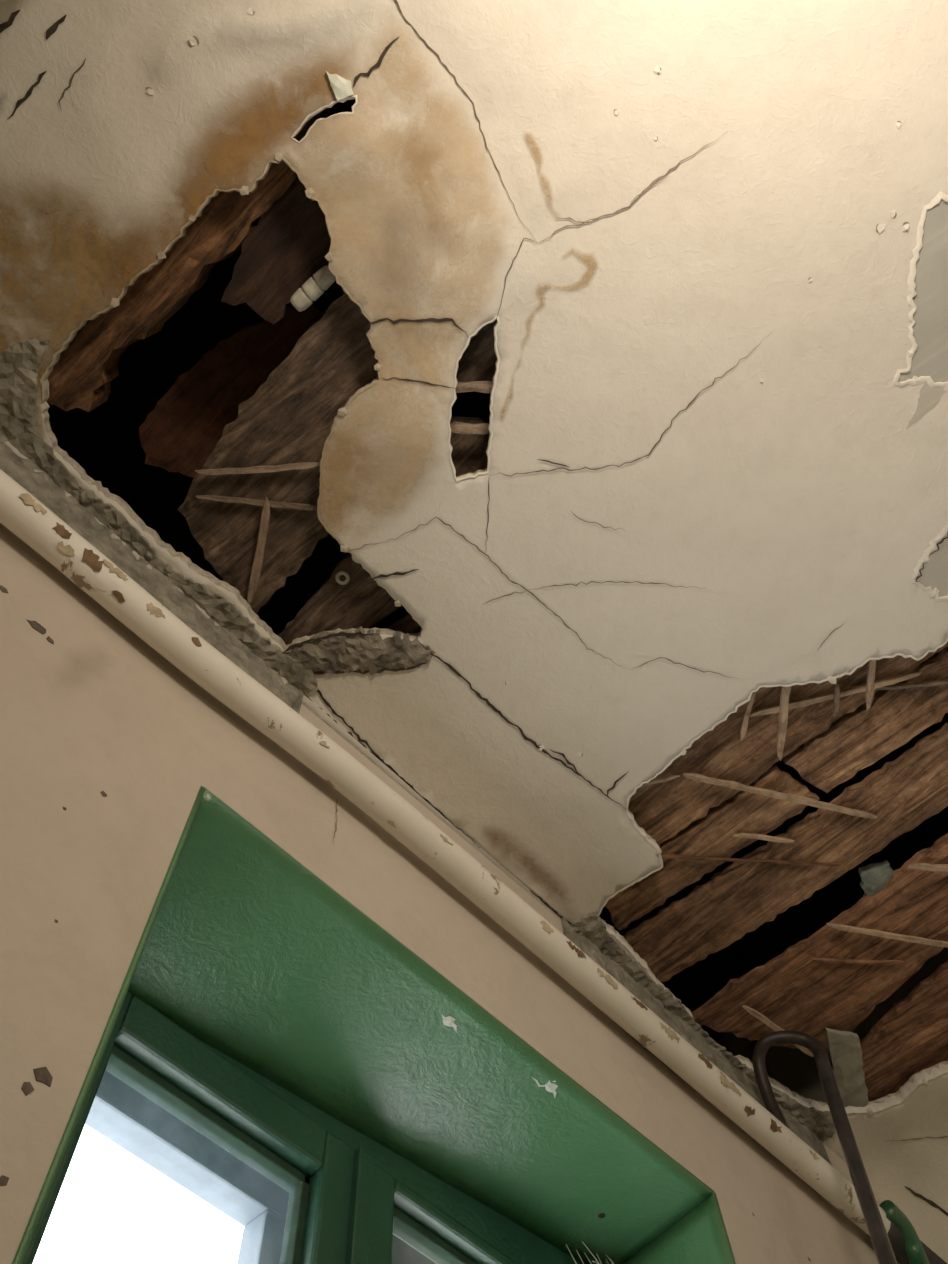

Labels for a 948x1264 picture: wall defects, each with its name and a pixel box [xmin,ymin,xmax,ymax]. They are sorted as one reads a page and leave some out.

flaking render [290,71,359,144]
crack [353,0,726,321]
flaking render [0,153,382,714]
damp [0,64,496,529]
crack [367,318,469,338]
flaking render [447,316,501,482]
crack [348,331,773,679]
peeling [876,191,948,429]
peeling [911,524,948,602]
crack [274,652,480,848]
crack [414,639,629,810]
flaking render [540,638,948,1165]